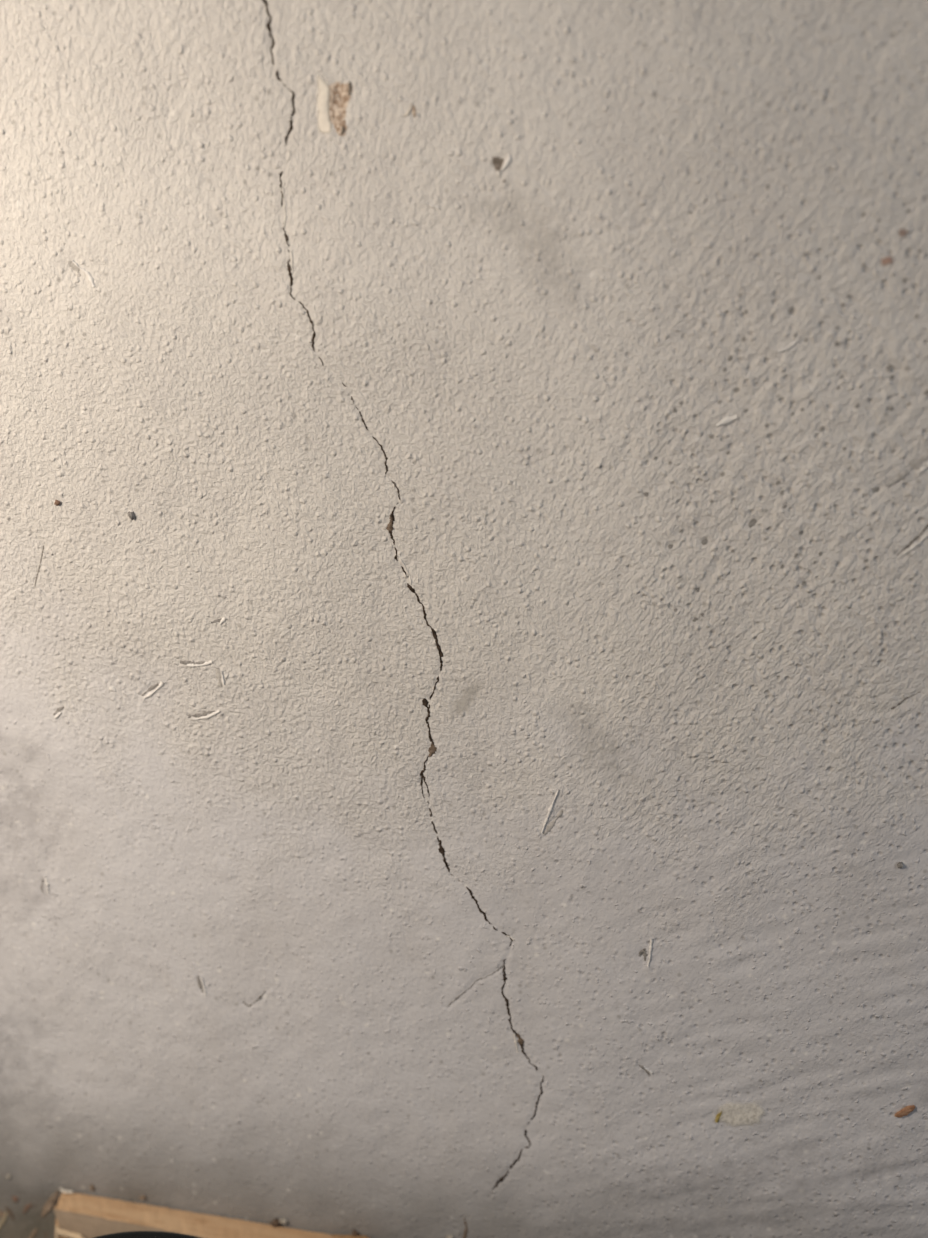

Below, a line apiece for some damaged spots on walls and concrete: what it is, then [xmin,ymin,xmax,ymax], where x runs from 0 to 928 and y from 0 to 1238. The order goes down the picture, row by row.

crack [263,0,544,1197]
crack [461,1218,469,1238]